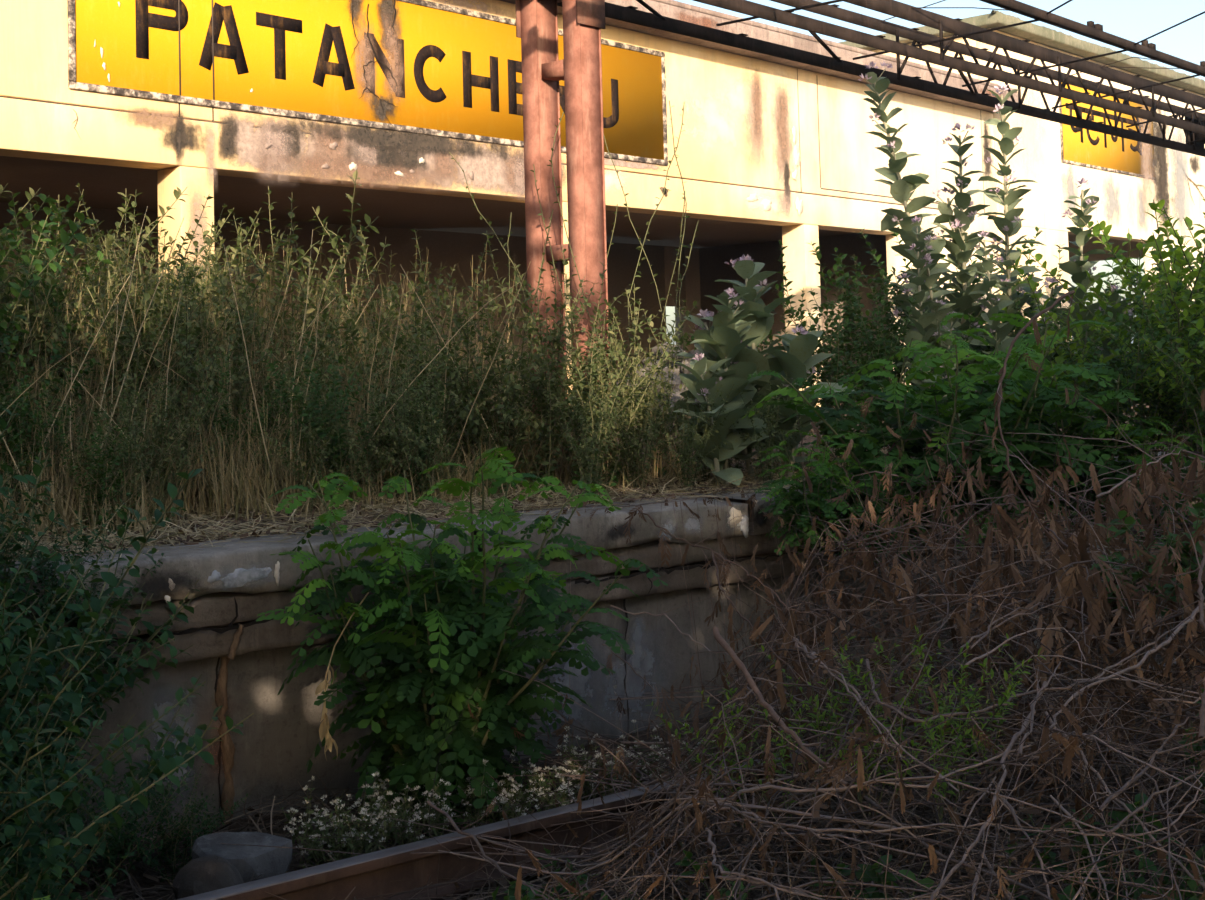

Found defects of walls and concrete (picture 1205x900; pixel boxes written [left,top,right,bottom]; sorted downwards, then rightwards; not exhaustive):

damp [350,0,402,121]
damp [443,0,497,13]
damp [748,83,793,205]
damp [1106,181,1119,220]
damp [1139,110,1200,226]